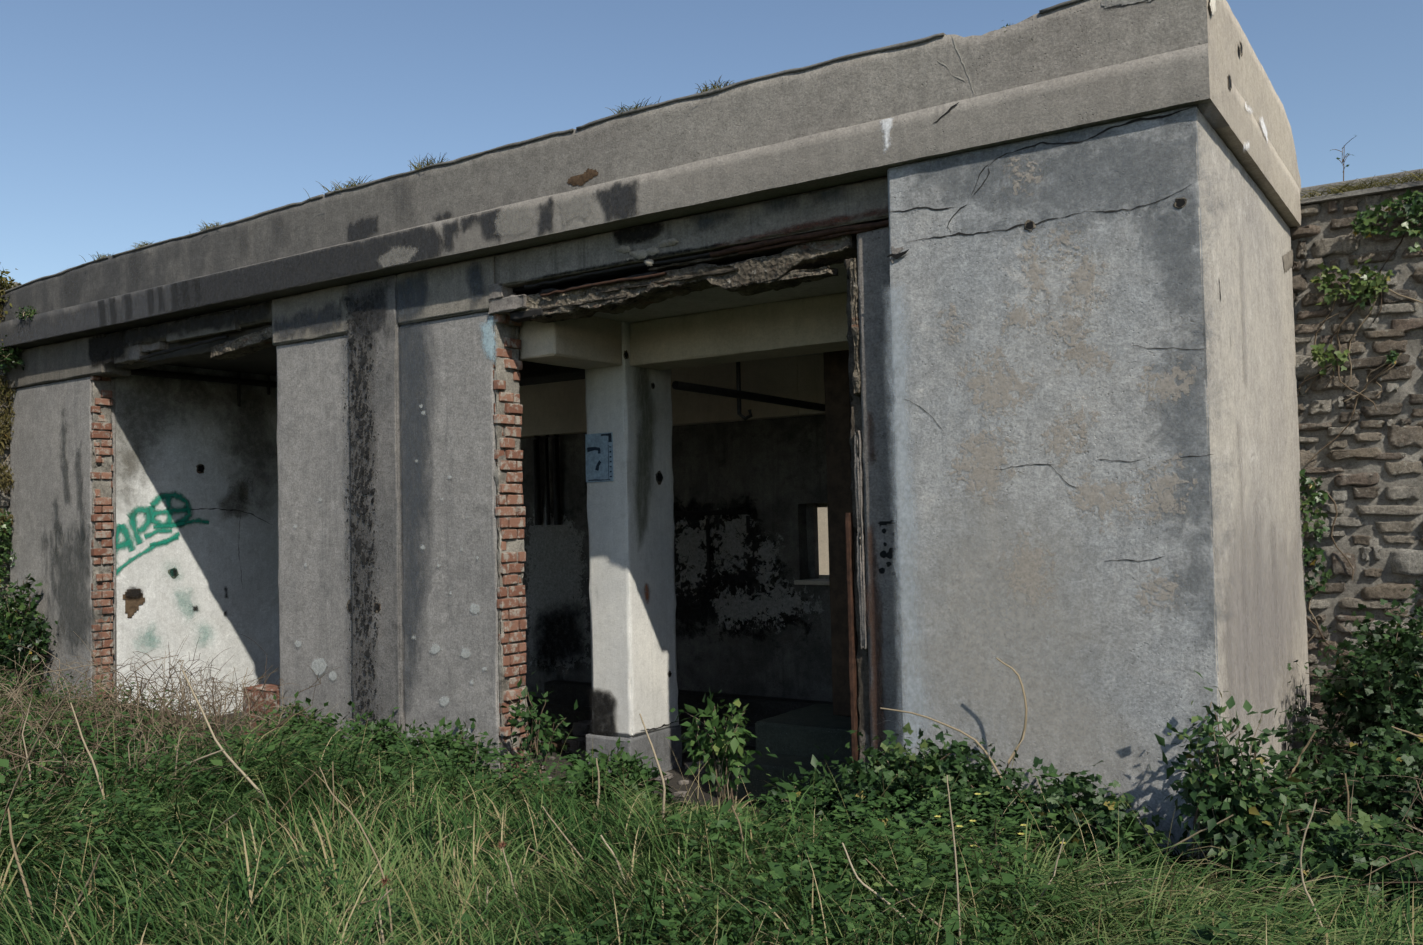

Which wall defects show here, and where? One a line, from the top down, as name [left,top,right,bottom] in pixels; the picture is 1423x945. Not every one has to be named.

leakage [348,216,378,241]
spalling [887,246,909,263]
crack [893,105,1201,242]
leakage [45,412,94,652]
flaking render [90,315,273,701]
spalling [488,207,898,782]
crack [995,463,1083,490]
crack [1100,454,1212,462]